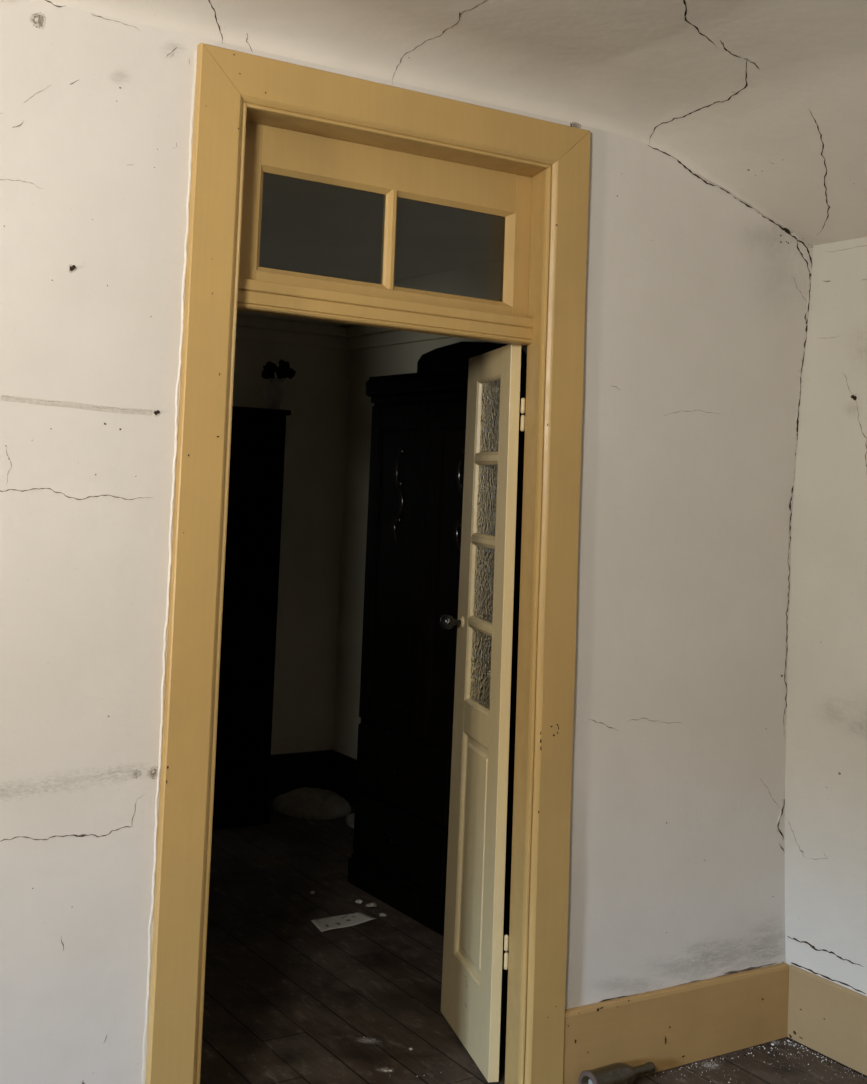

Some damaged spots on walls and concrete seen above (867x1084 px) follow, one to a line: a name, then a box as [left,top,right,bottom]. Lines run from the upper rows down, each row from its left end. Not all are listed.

crack [392,0,487,79]
crack [648,0,867,723]
crack [0,446,149,500]
crack [0,794,145,842]
crack [788,936,864,967]